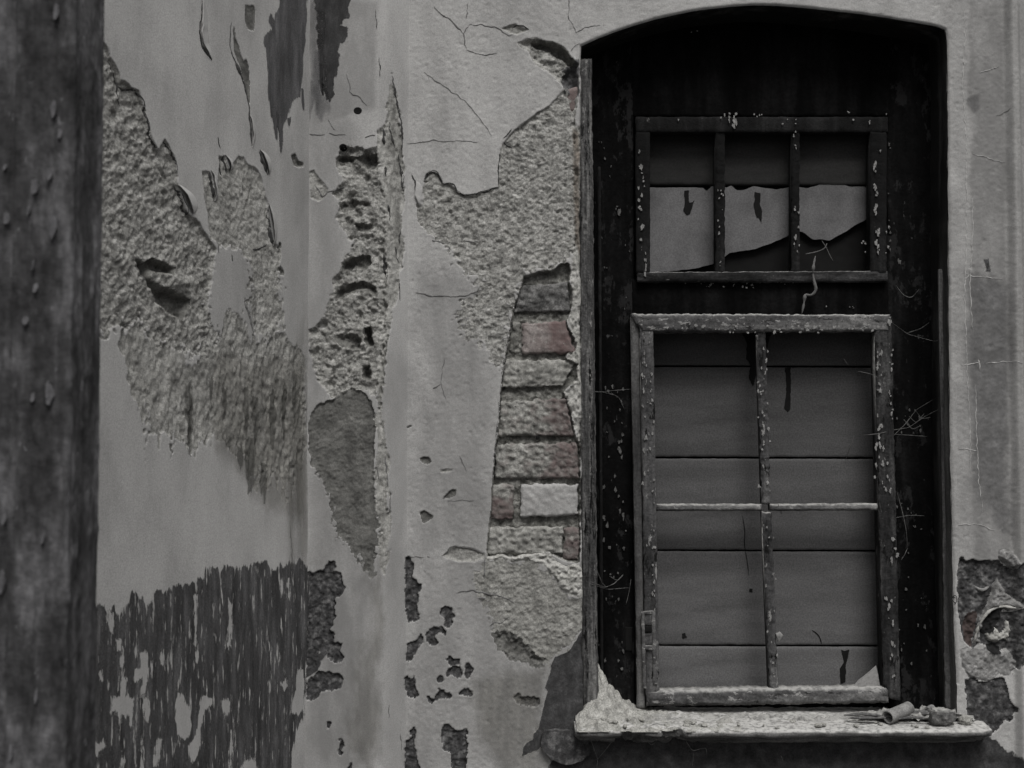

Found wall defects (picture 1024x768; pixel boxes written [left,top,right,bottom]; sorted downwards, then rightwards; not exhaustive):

peeling [233,5,255,103]
crack [434,4,528,56]
flaking render [100,24,582,575]
peeling [95,558,346,768]
peeling [404,556,422,623]
peeling [406,606,455,662]
peeling [404,656,474,704]
flaking render [956,549,1024,670]
peeling [405,727,420,768]
peeling [441,724,468,768]